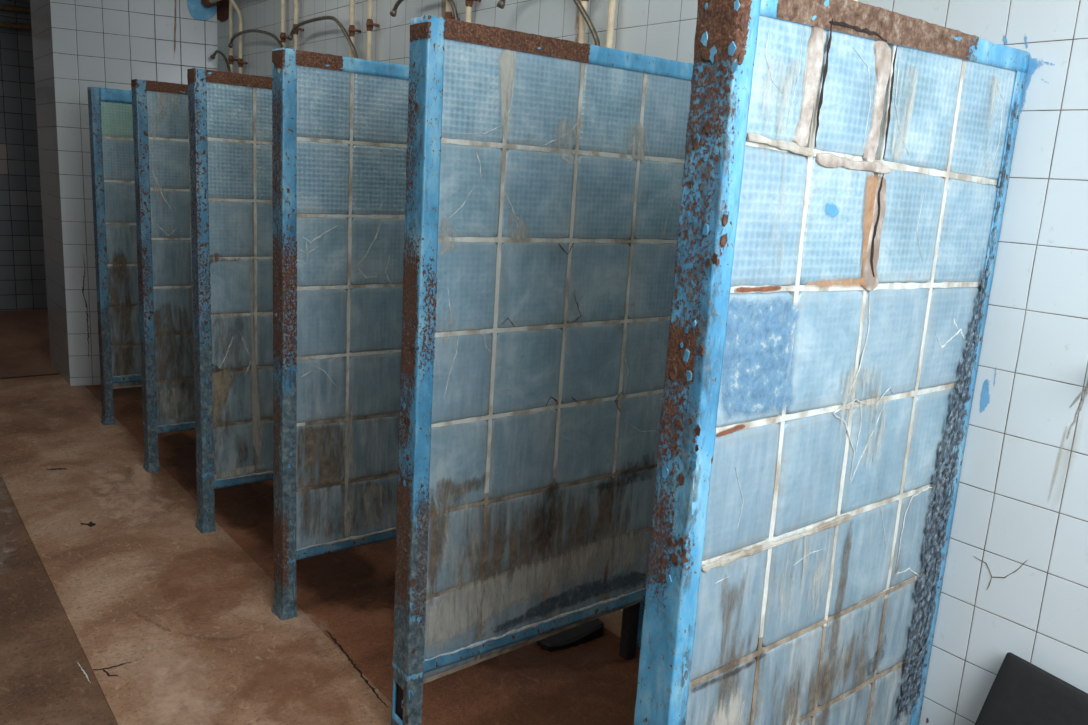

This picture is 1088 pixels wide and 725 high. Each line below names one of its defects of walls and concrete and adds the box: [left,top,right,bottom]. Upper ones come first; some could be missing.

rust [410,22,431,43]
rust [442,0,591,63]
rust [777,0,979,61]
crack [765,19,909,483]
rust [131,49,344,599]
rust [394,56,438,654]
rust [646,0,752,614]
damp [424,529,646,661]
crack [974,556,1025,589]
damp [480,628,632,669]
damp [714,692,743,725]